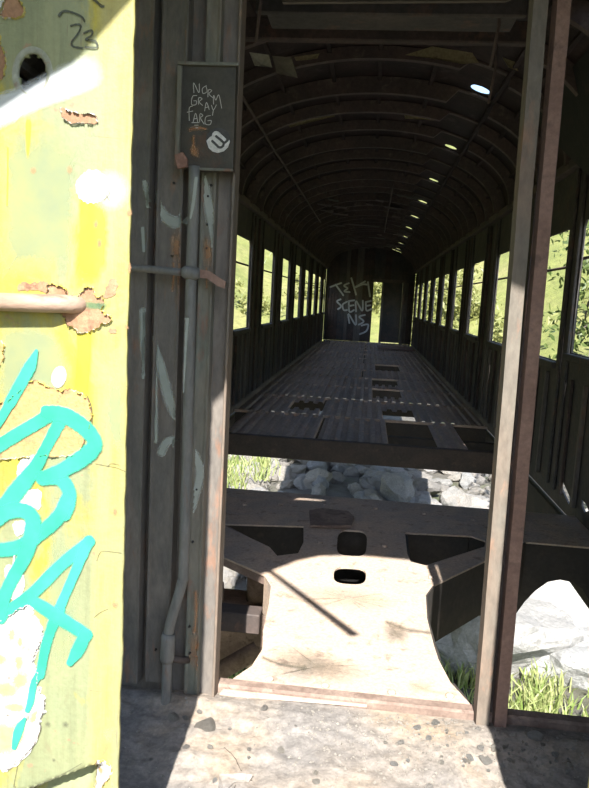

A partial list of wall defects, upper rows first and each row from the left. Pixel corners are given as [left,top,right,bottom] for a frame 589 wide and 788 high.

peeling [17,278,118,334]
peeling [49,565,75,618]
peeling [0,574,70,772]
peeling [94,759,113,788]